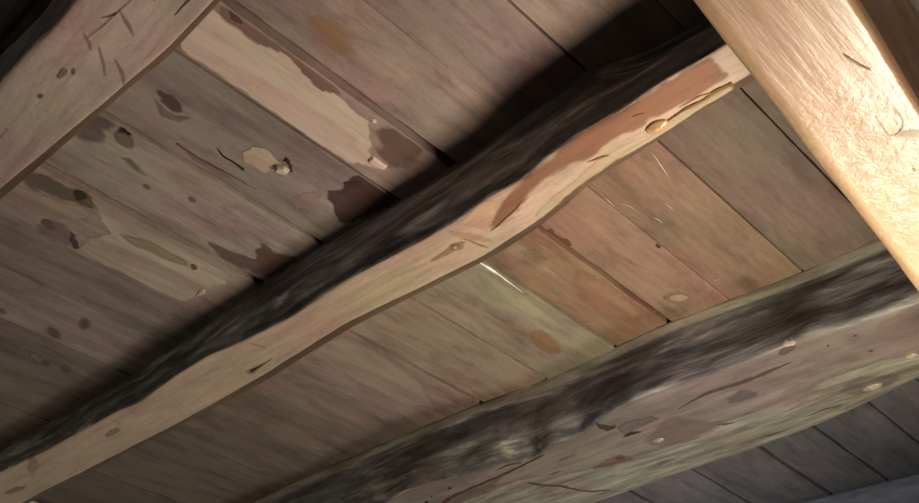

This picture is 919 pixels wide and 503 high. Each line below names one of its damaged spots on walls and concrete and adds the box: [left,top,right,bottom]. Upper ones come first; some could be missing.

crack [88,0,132,38]
leakage [157,91,188,121]
peeling [180,8,387,170]
leakage [78,117,113,141]
peeling [217,147,293,175]
leakage [379,129,421,166]
leakage [491,59,727,226]
leakage [24,173,94,208]
leakage [328,176,395,224]
leakage [42,220,79,249]
peeling [5,185,228,301]
leakage [209,243,298,277]